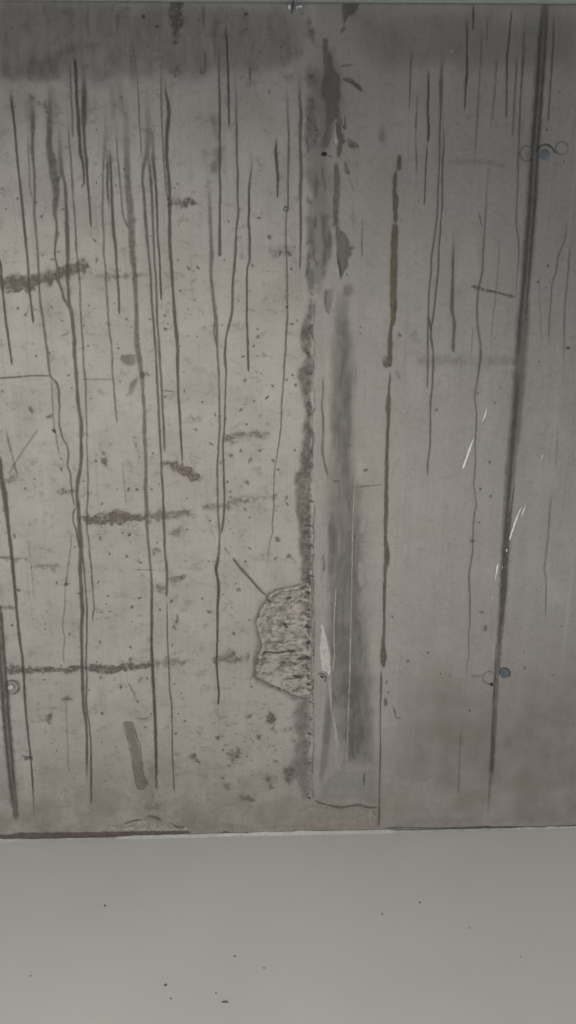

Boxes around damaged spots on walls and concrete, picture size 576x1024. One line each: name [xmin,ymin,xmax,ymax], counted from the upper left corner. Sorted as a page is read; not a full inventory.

water stain [0,260,12,365]
water stain [10,60,183,799]
water stain [210,34,251,703]
water stain [272,109,302,521]
water stain [336,224,354,279]
rust [381,155,401,667]
water stain [424,77,443,471]
crack [472,285,514,297]
water stain [487,8,547,771]
water stain [0,458,34,816]
spalling [249,583,312,698]
water stain [319,590,349,761]